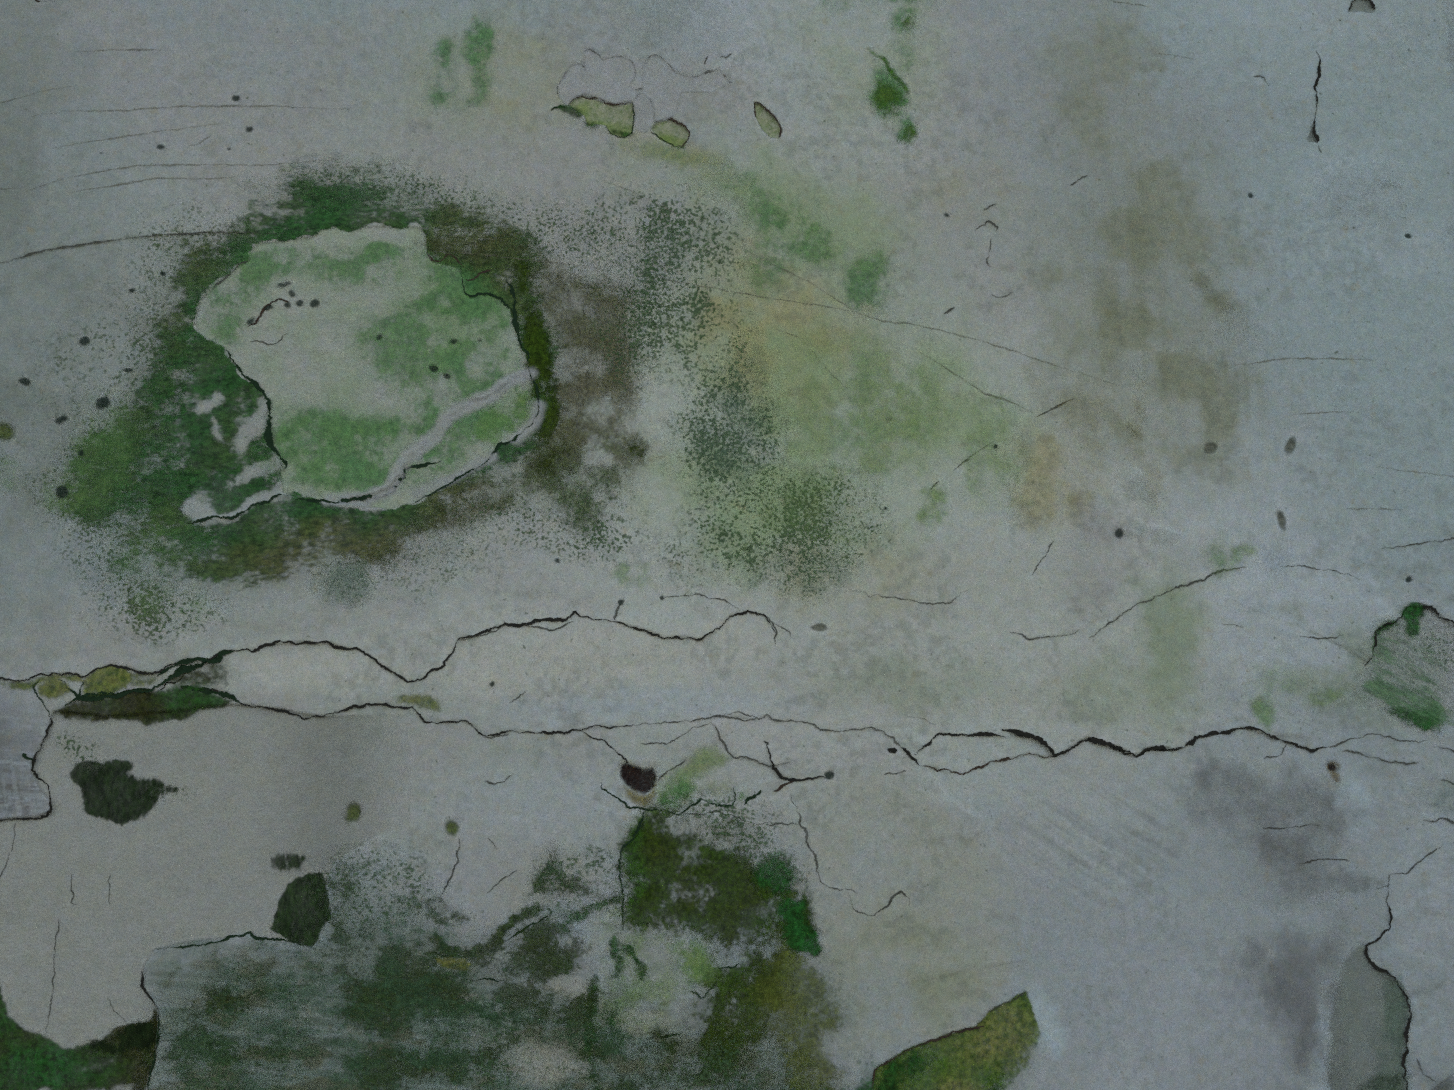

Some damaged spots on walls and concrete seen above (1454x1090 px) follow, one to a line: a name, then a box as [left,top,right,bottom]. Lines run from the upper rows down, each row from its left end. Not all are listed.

peeling [551,48,732,148]
crack [1308,50,1322,153]
peeling [190,226,544,524]
water stain [44,167,887,643]
crack [854,590,967,605]
crack [1010,565,1358,640]
flaking render [1366,602,1454,731]
flaking render [0,705,343,1090]
water stain [324,793,838,1090]
crack [0,593,1454,1090]
water stain [168,975,286,1090]
flaking render [871,991,1039,1090]